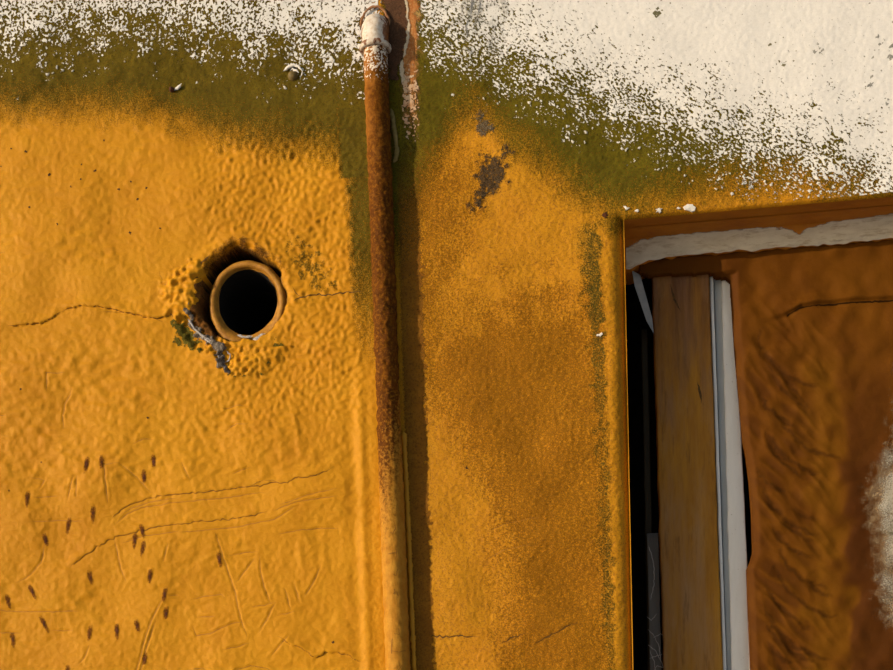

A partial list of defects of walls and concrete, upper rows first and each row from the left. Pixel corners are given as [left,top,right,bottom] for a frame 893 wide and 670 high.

corrosion [402,0,421,114]
crack [9,305,172,327]
crack [787,300,893,317]
damp [416,147,613,670]
crack [69,470,328,568]